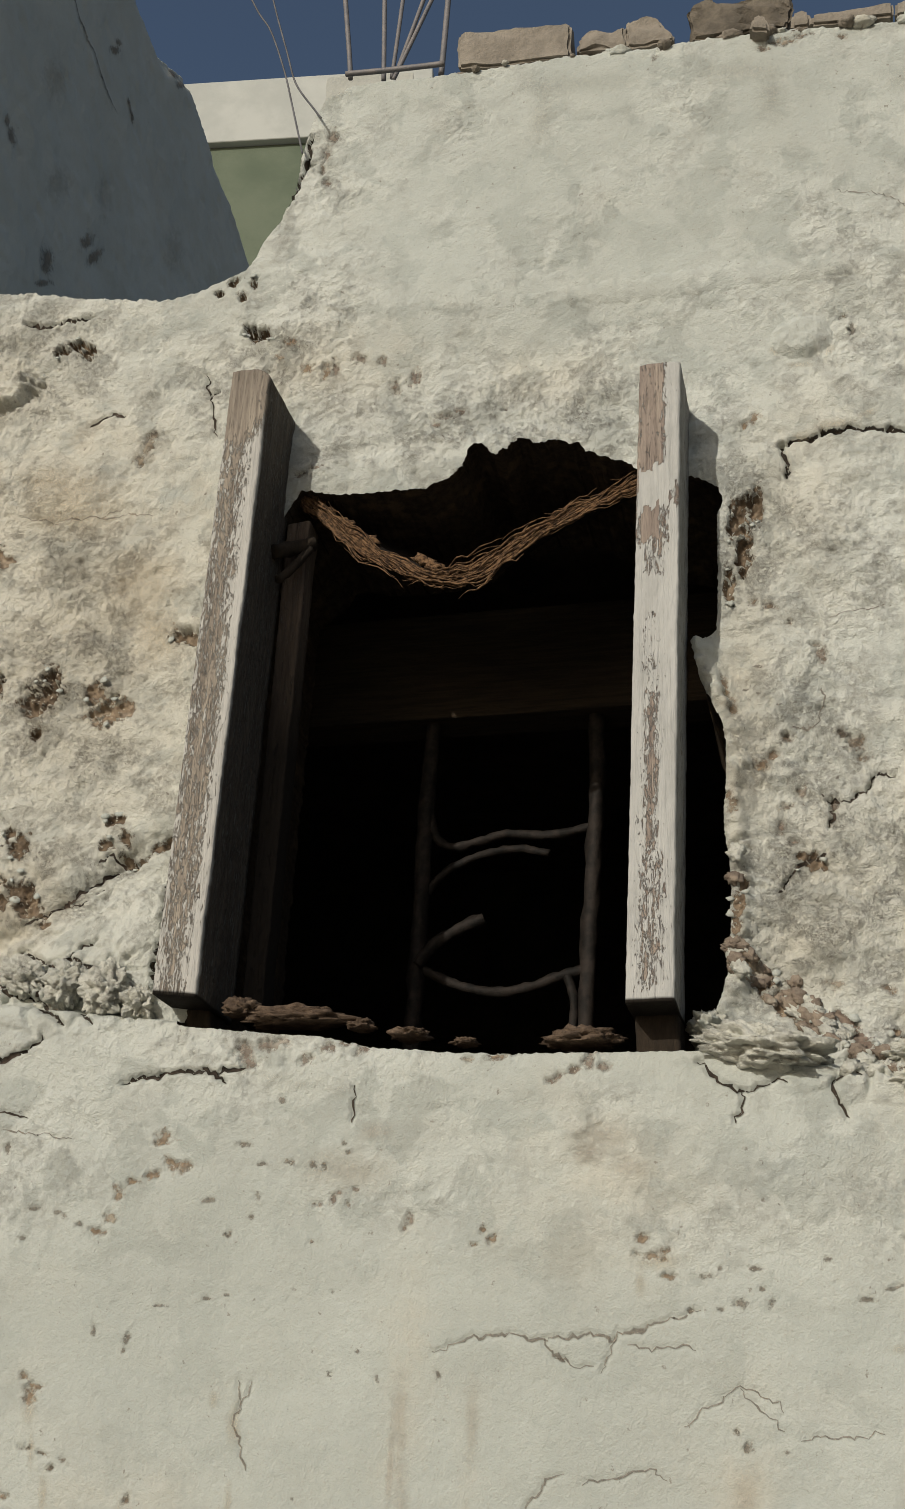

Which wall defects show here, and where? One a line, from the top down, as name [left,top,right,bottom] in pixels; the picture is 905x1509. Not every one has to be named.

crack [780,425,905,479]
flaking render [722,481,764,607]
flaking render [0,663,136,742]
flaking render [98,812,172,873]
flaking render [0,826,51,930]
crack [0,853,166,1064]
flaking render [726,879,814,1032]
flaking render [835,1010,904,1049]
crack [124,1066,246,1085]
crack [697,1062,788,1123]
crack [831,1071,862,1118]
crack [432,1310,701,1373]